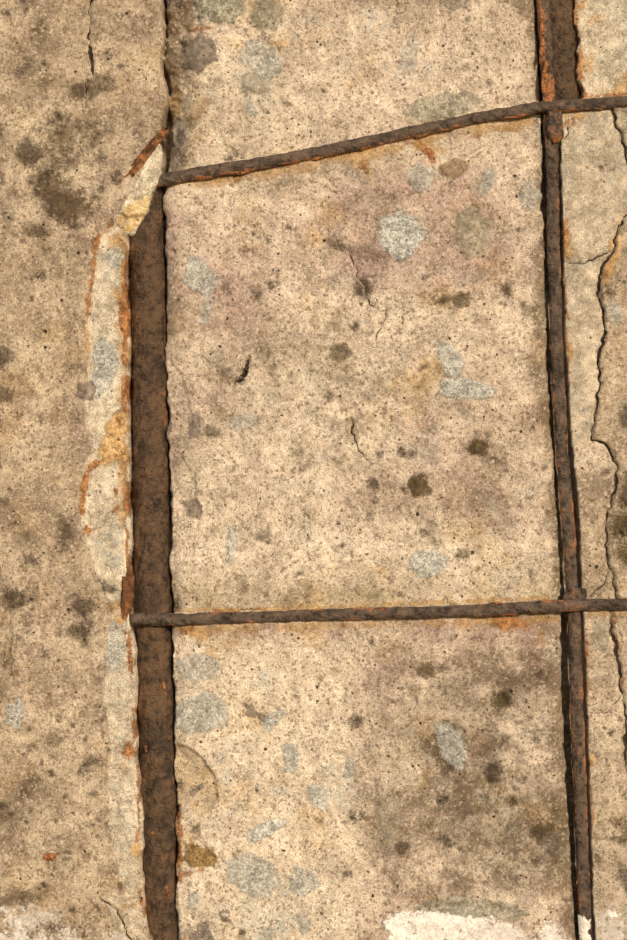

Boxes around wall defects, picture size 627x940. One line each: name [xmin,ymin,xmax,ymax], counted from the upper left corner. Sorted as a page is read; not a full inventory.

crack [85,0,94,104]
rust [539,19,549,94]
rust [404,133,439,164]
crack [611,109,627,163]
rust [562,221,573,256]
spalling [81,144,172,607]
crack [570,214,627,771]
rust [480,616,528,631]
spalling [104,641,141,897]
rust [121,708,156,858]